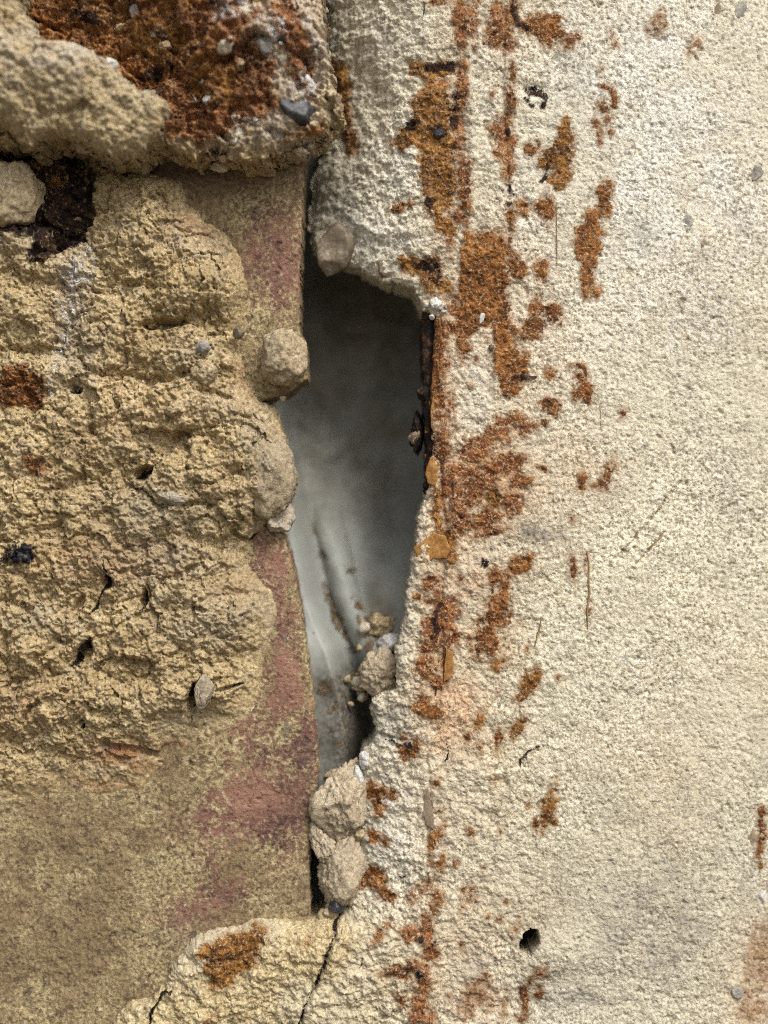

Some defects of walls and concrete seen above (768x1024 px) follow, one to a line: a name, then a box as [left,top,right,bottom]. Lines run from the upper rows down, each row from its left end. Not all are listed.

corrosion [27,0,316,147]
corrosion [591,68,618,145]
peeling [25,243,46,263]
corrosion [387,0,594,582]
corrosion [573,179,616,300]
corrosion [409,553,536,721]
corrosion [366,779,398,847]
flaking render [421,779,434,830]
crack [149,990,172,1024]
corrosion [196,921,267,990]
crack [298,913,363,1024]
corrosion [359,809,458,1024]